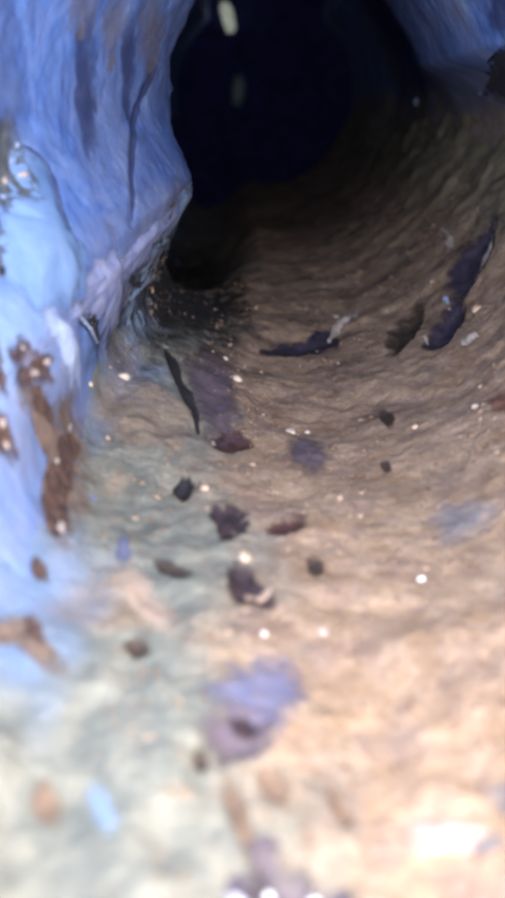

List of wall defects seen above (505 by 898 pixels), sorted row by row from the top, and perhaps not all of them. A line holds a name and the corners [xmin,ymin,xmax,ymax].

spalling [477,48,505,102]
corrosion [0,337,88,544]